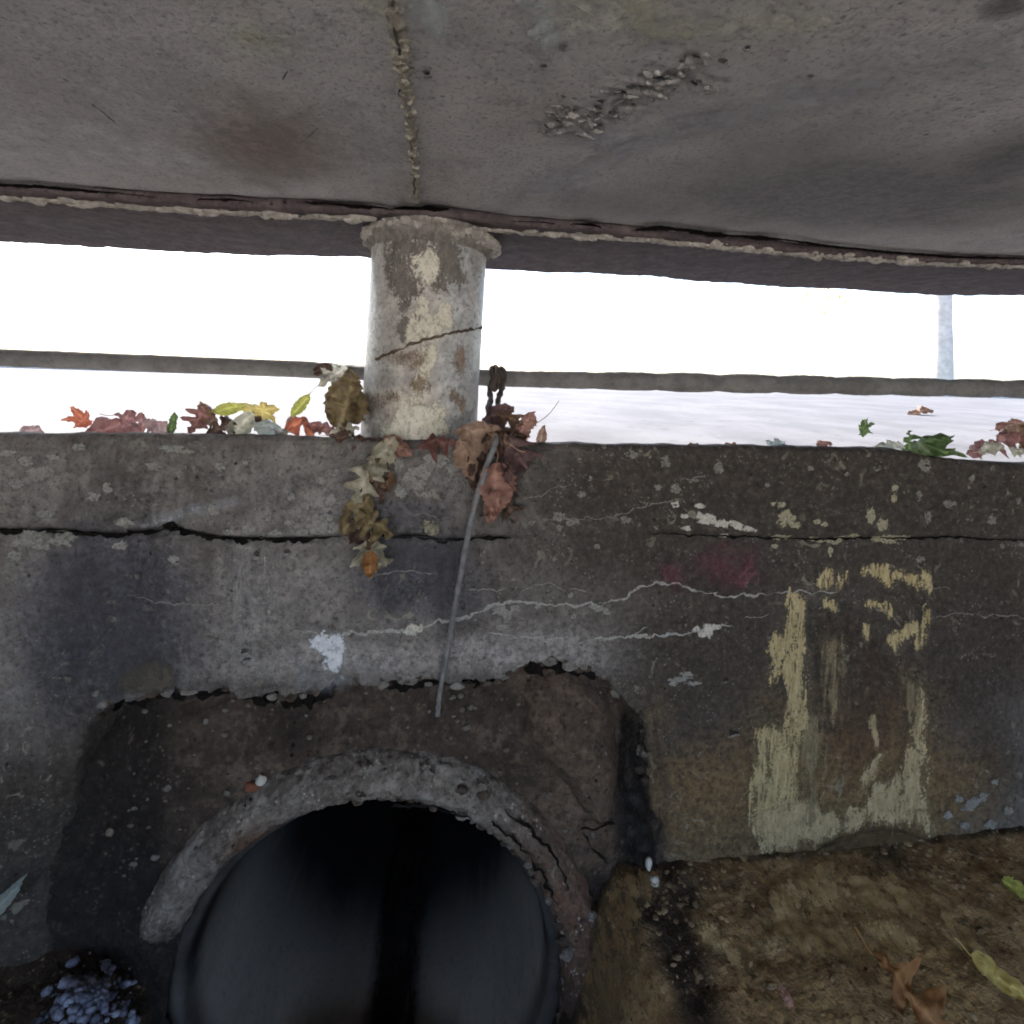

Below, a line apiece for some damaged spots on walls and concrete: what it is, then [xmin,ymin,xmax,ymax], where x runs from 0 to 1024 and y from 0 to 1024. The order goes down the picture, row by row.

crack [305,0,449,212]
spalling [541,53,728,140]
crack [0,183,157,198]
crack [636,225,1024,259]
crack [375,326,483,361]
crack [382,513,510,545]
crack [128,581,837,693]
spalling [540,656,592,673]
spalling [136,687,198,727]
spalling [266,671,514,739]
spalling [455,782,598,962]
water stain [577,712,662,1024]